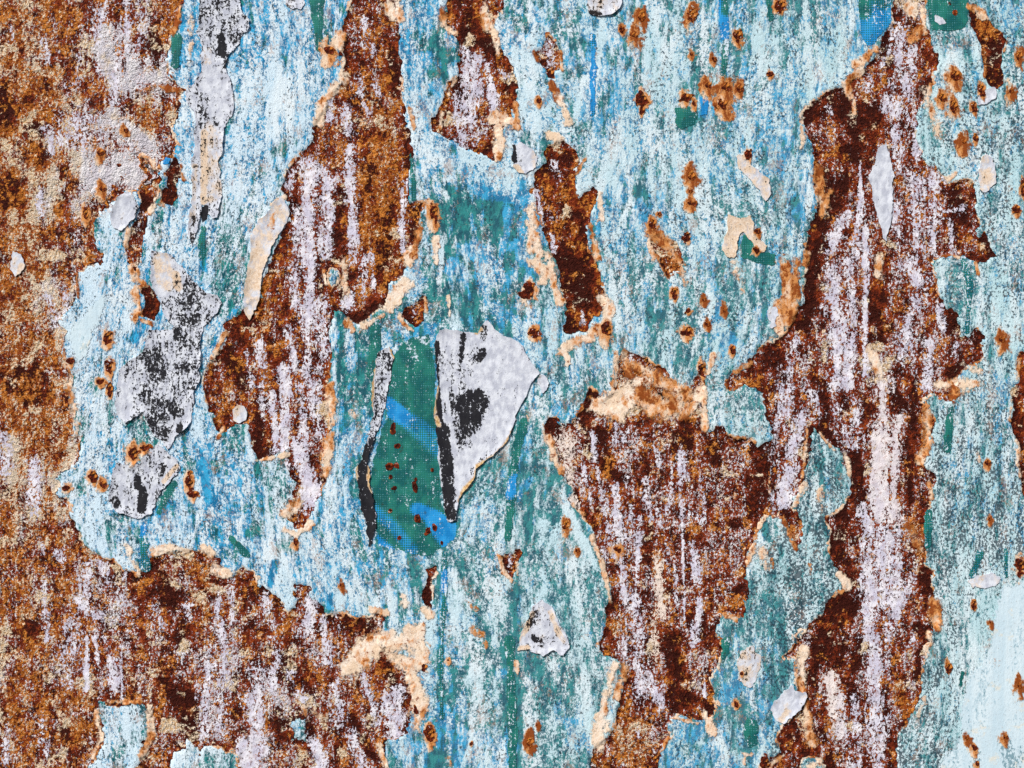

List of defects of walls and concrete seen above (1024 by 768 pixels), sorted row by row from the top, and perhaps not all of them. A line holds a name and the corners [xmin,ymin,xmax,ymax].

peeling [108,250,222,572]
peeling [185,0,250,259]
rust [0,0,441,768]
peeling [243,196,290,320]
peeling [355,314,549,720]
rust [431,0,522,162]
rust [518,0,1024,768]
peeling [869,144,895,241]
peeling [504,600,570,768]